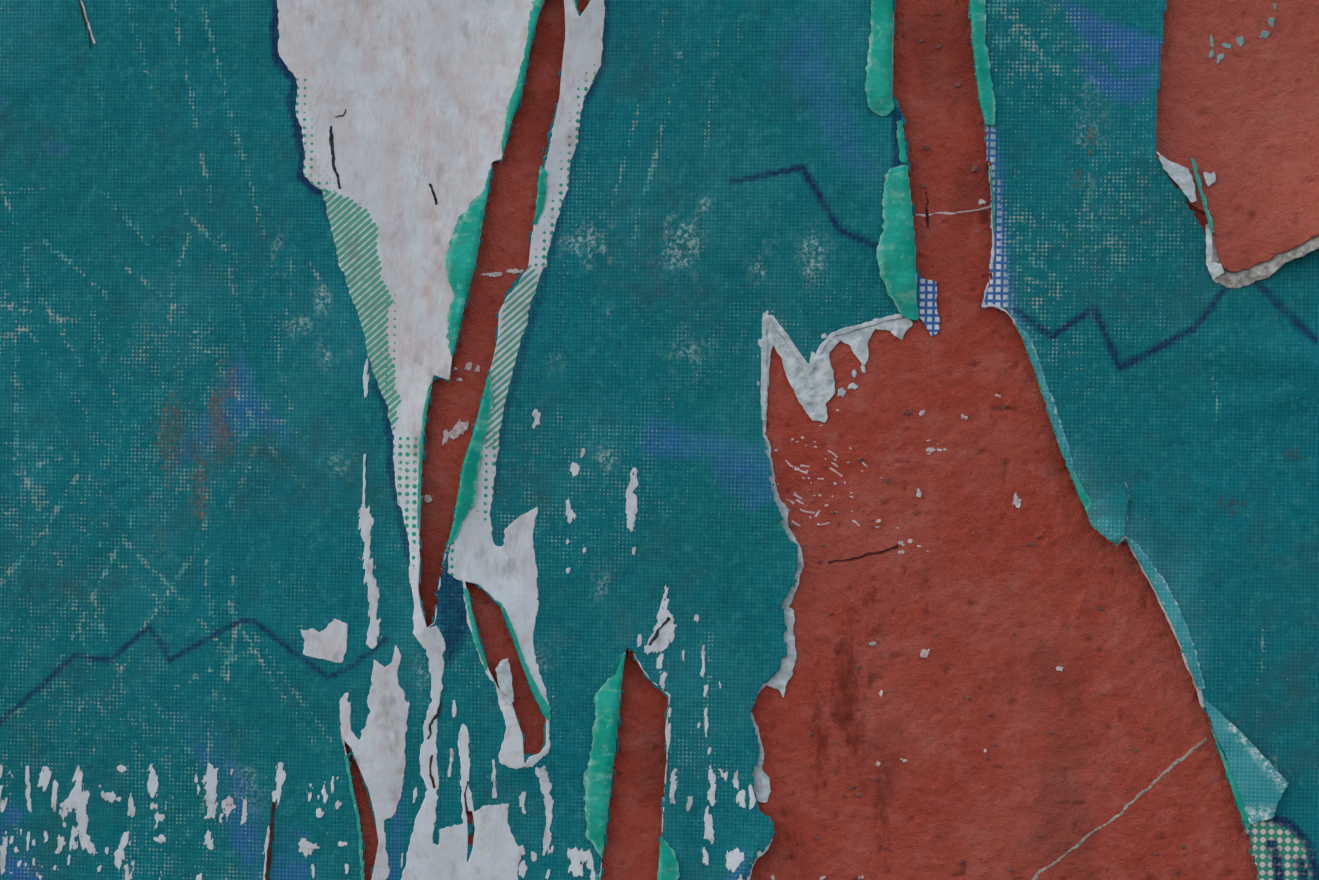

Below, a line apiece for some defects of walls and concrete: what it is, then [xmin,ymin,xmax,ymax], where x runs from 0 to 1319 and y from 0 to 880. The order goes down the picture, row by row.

peeling [1209,3,1276,64]
peeling [1157,152,1224,280]
peeling [277,0,605,880]
peeling [625,467,638,555]
peeling [669,311,913,865]
crack [828,545,899,563]
peeling [0,764,173,880]
peeling [194,763,247,850]
peeling [262,826,270,880]
peeling [266,762,286,808]
crack [1032,738,1207,880]